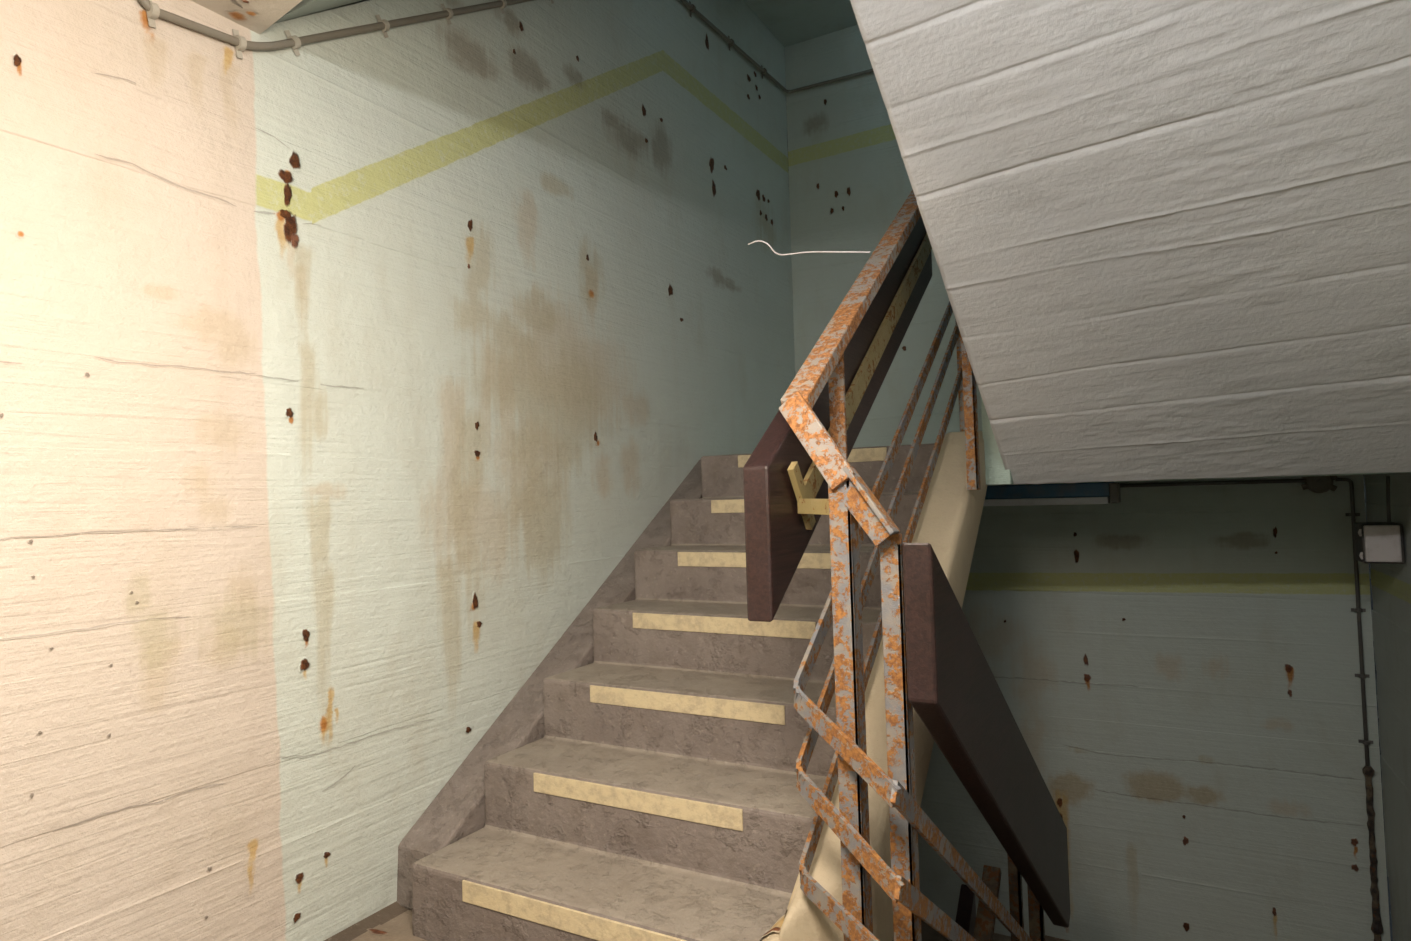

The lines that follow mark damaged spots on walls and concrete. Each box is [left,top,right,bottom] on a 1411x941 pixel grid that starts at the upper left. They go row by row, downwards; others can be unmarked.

water stain [422,0,675,188]
corrosion [273,147,317,343]
crack [95,357,363,389]
water stain [414,165,653,730]
water stain [290,339,351,769]
corrosion [319,685,341,745]
corrosion [471,589,483,656]
water stain [962,600,1234,812]
corrosion [1283,662,1297,699]
corrosion [243,836,263,899]
corrosion [1049,788,1078,935]